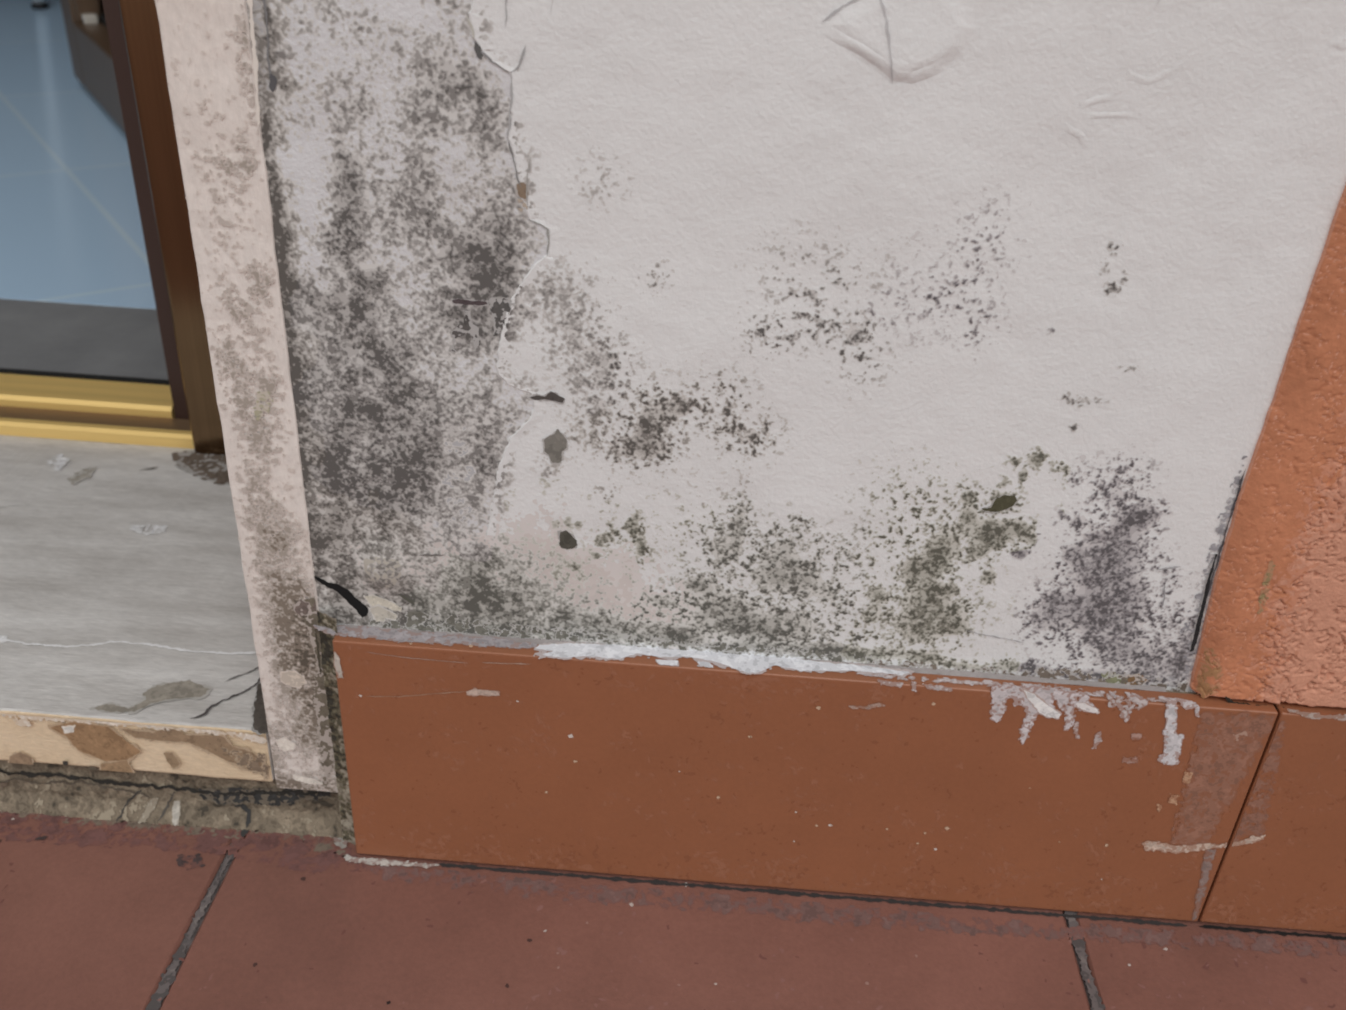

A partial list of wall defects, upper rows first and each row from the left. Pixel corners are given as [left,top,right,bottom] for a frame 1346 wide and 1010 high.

crack [822,0,893,81]
leakage [566,145,635,213]
peeling [247,0,568,536]
leakage [634,259,675,297]
mould [1099,240,1129,296]
mould [1061,391,1110,432]